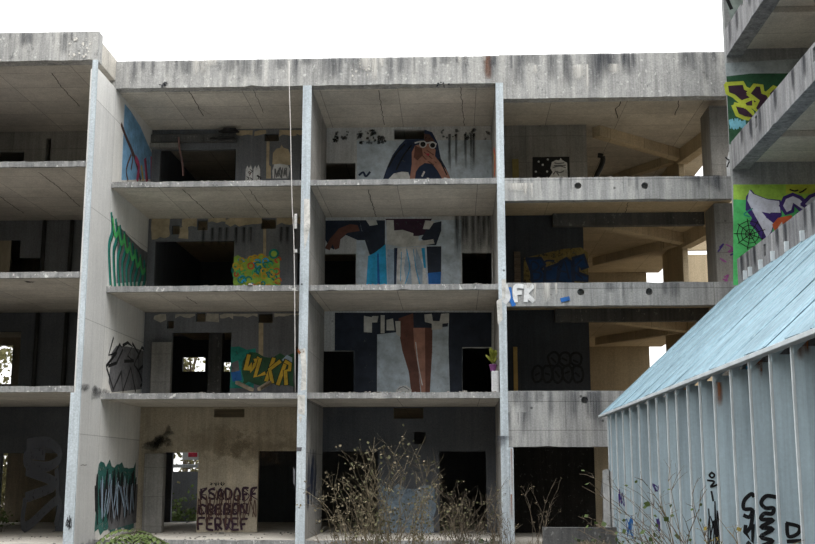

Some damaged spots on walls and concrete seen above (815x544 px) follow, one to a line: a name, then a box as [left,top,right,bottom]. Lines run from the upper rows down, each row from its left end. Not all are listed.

water stain [441,128,476,164]
peeling [151,219,197,240]
peeling [277,199,310,249]
water stain [455,216,491,250]
peeling [205,313,263,356]